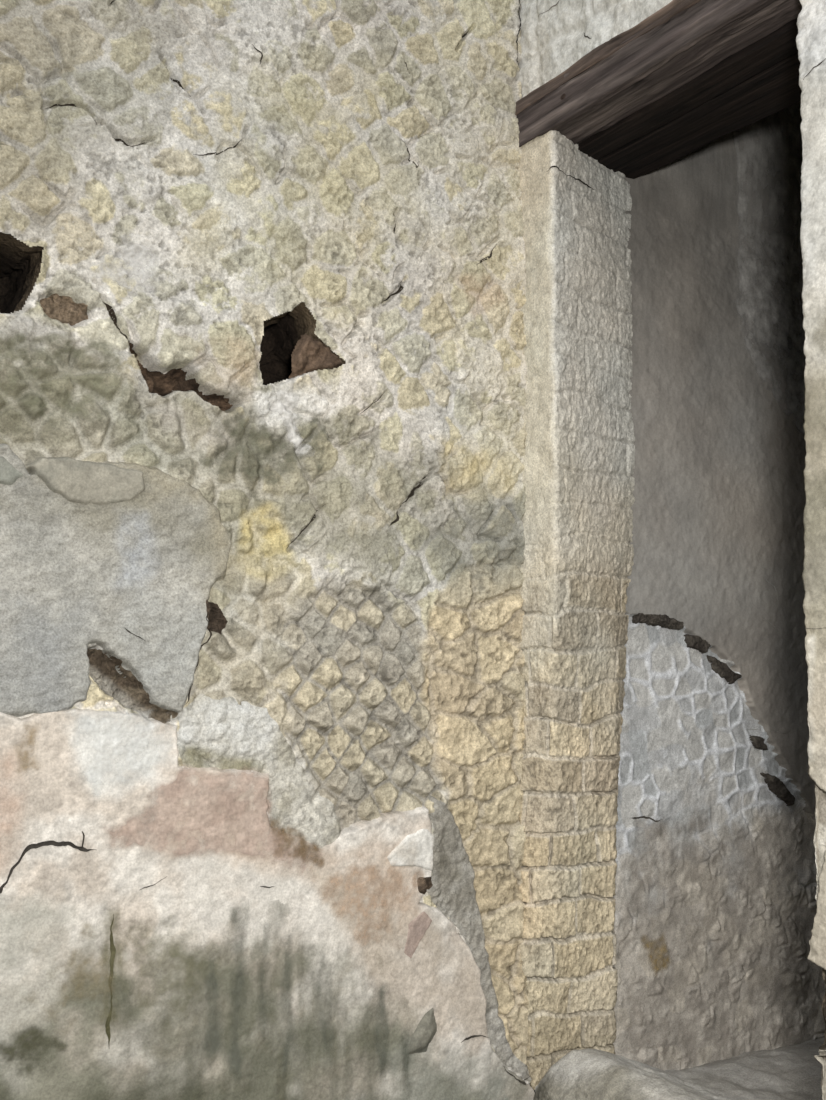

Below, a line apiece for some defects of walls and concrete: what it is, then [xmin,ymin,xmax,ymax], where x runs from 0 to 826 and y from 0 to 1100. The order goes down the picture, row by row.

spalling [0,232,44,314]
spalling [259,301,346,385]
crack [0,831,95,893]
spalling [613,613,826,1100]